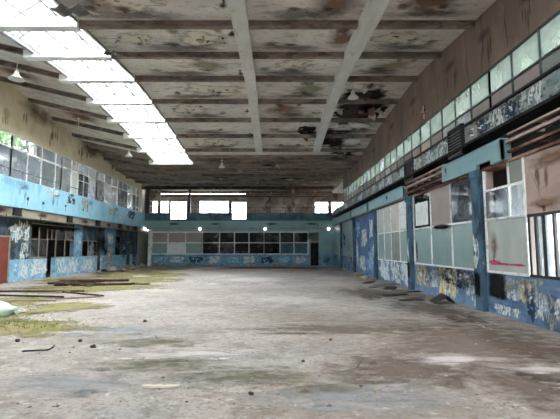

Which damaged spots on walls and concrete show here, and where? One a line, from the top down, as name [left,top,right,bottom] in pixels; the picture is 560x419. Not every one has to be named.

leakage [275,0,353,20]
leakage [26,105,53,125]
peeling [335,83,384,123]
peeling [456,80,544,142]
peeling [9,221,47,281]
peeling [415,236,479,306]
peeling [494,275,560,331]